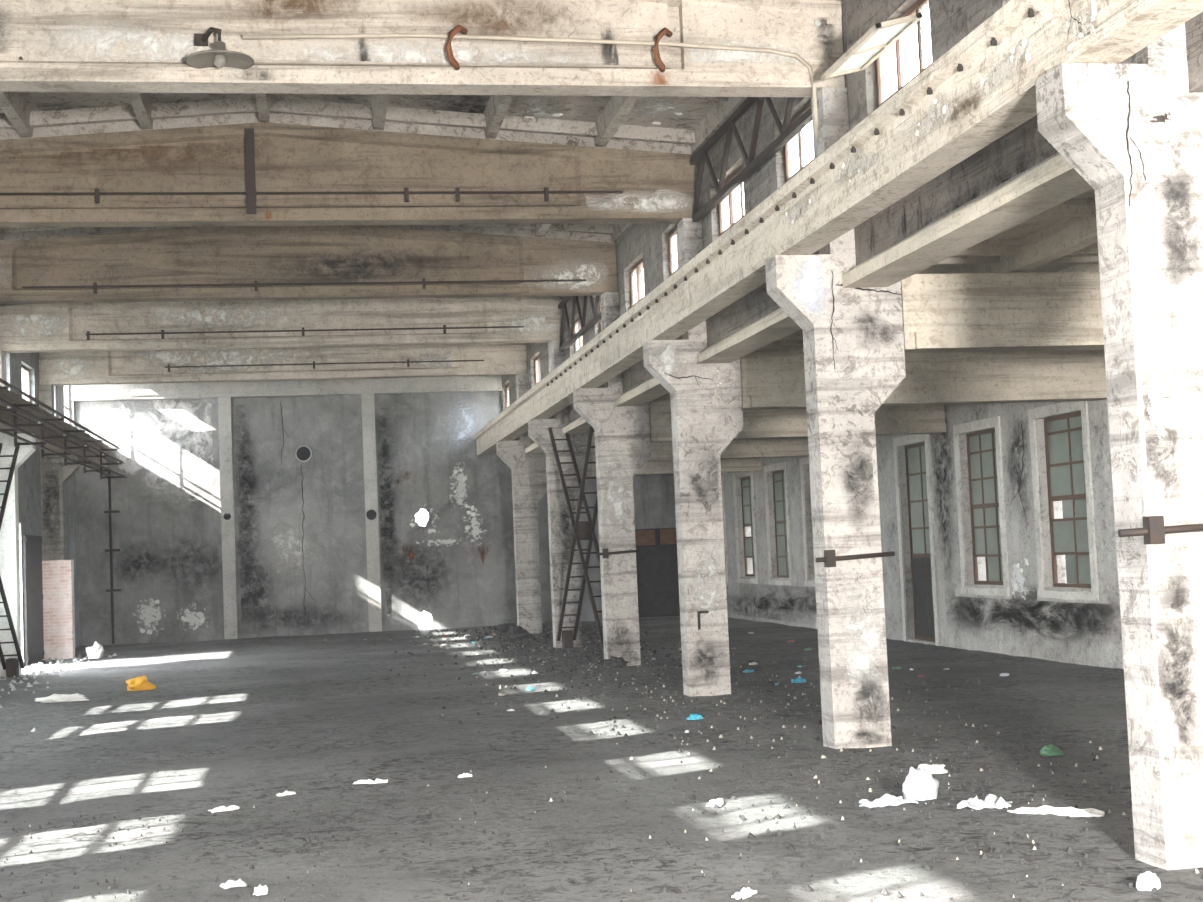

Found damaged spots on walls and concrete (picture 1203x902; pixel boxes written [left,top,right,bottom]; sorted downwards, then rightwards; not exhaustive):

damp [258,0,326,17]
damp [1165,180,1197,282]
peeling [1147,363,1169,439]
damp [237,414,341,625]
damp [954,591,1112,633]